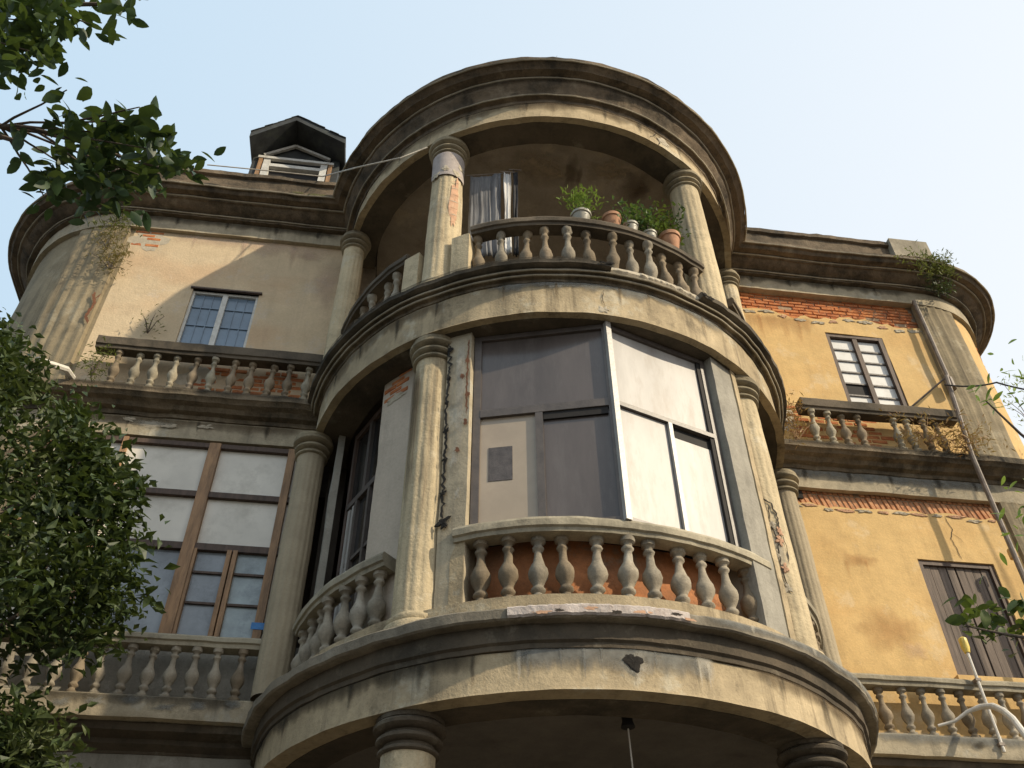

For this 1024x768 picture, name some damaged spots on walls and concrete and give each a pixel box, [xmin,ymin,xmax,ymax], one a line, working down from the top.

peeling [431,152,465,226]
spalling [127,230,171,251]
spalling [739,292,922,333]
spalling [797,490,998,523]
spalling [507,603,697,623]
spalling [623,654,644,676]